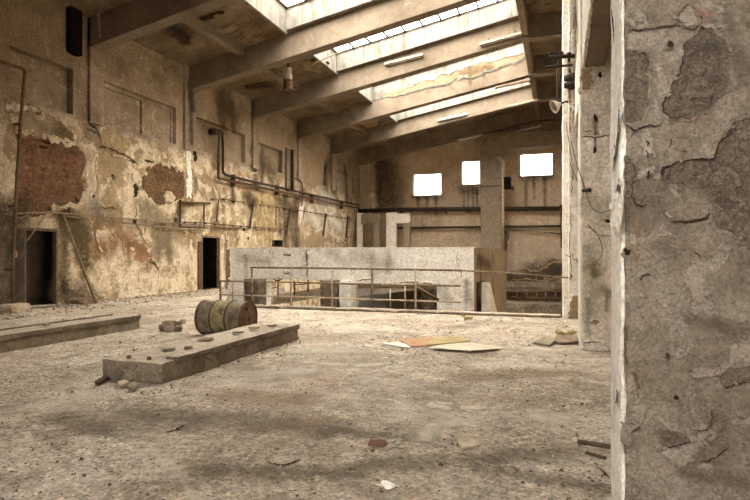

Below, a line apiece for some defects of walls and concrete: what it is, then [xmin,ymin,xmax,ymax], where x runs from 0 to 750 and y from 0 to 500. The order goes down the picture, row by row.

flaking render [623,4,734,127]
flaking render [3,95,130,222]
crack [95,142,138,164]
flaking render [137,150,214,209]
flaking render [659,114,750,255]
flaking render [719,363,750,389]
crack [665,401,730,462]